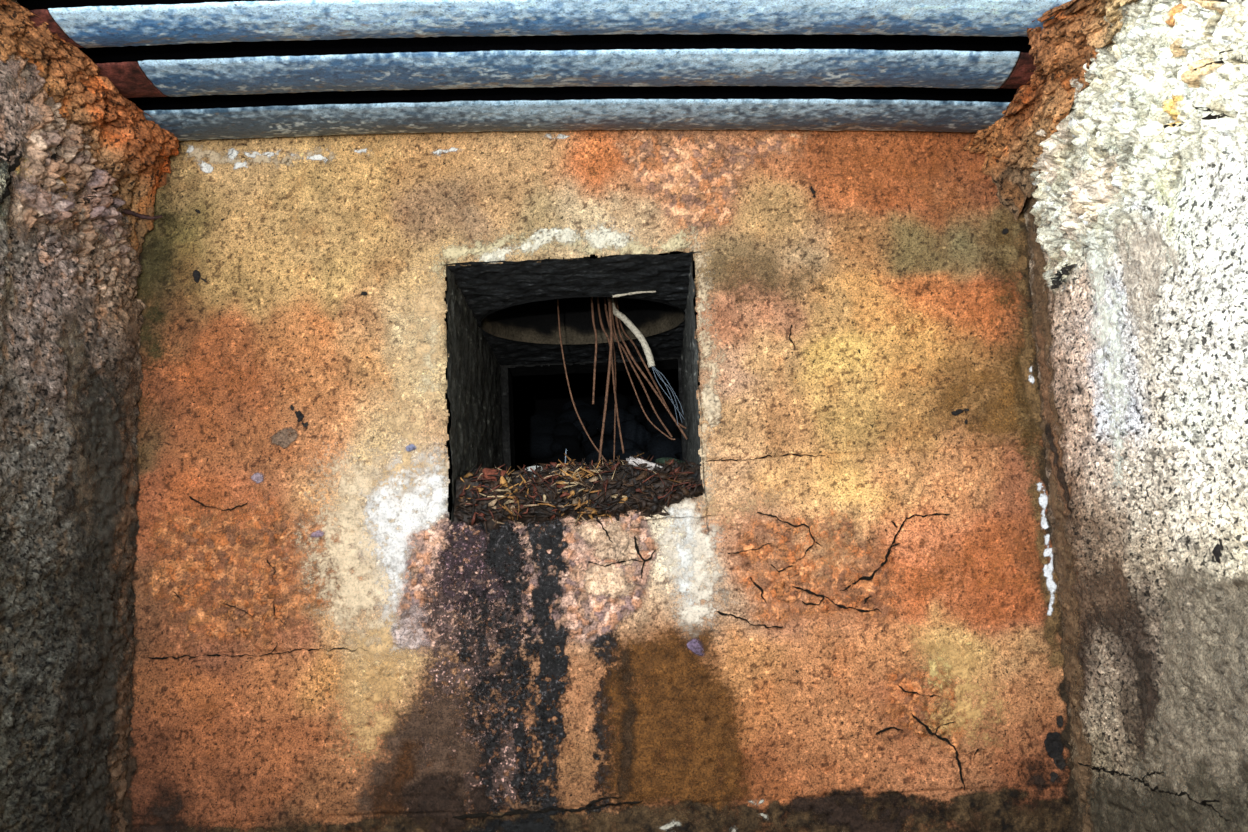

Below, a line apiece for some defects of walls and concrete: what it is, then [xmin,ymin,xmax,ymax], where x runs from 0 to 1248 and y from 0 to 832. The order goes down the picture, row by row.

crack [189,496,248,511]
damp [59,171,1248,832]
crack [148,560,368,660]
crack [716,512,950,628]
crack [876,685,979,791]
crack [1077,761,1231,821]